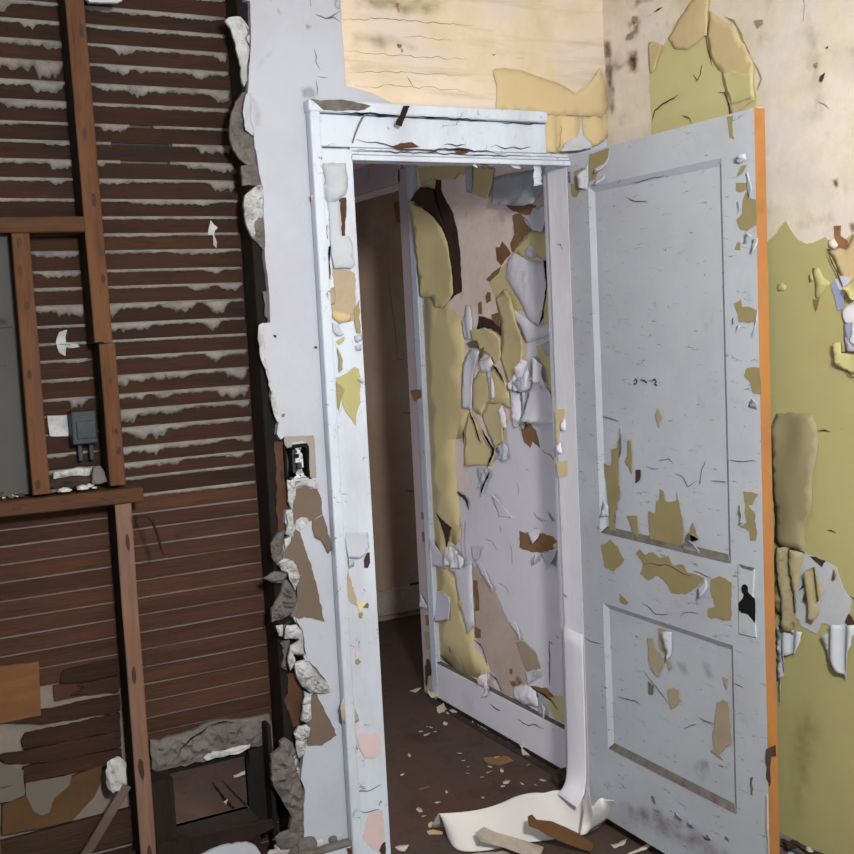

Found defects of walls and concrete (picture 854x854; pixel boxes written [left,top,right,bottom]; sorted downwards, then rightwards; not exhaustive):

spalling [224,16,265,251]
crack [310,0,474,92]
crack [342,112,540,125]
crack [357,139,531,157]
flaking render [335,0,605,109]
peeling [310,163,363,425]
peeling [423,180,462,300]
peeling [467,204,536,363]
peeling [809,225,854,374]
spalling [263,435,381,840]
peeling [636,549,732,621]
peeling [771,412,854,699]